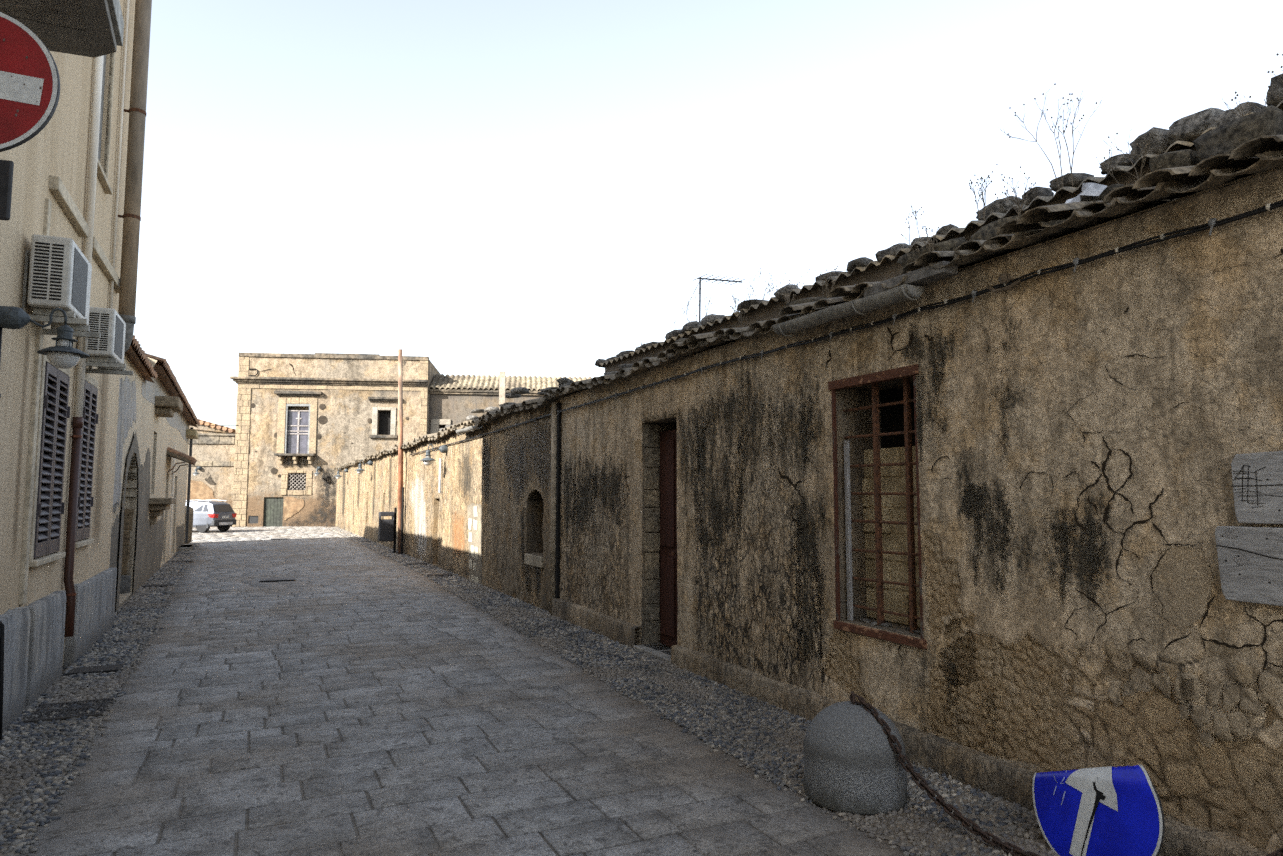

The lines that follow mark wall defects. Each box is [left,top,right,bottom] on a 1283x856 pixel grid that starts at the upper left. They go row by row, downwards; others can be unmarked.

water stain [458,430,547,596]
water stain [563,455,624,544]
water stain [678,365,825,562]
water stain [791,494,827,660]
water stain [957,452,1112,605]
crack [1019,354,1283,684]